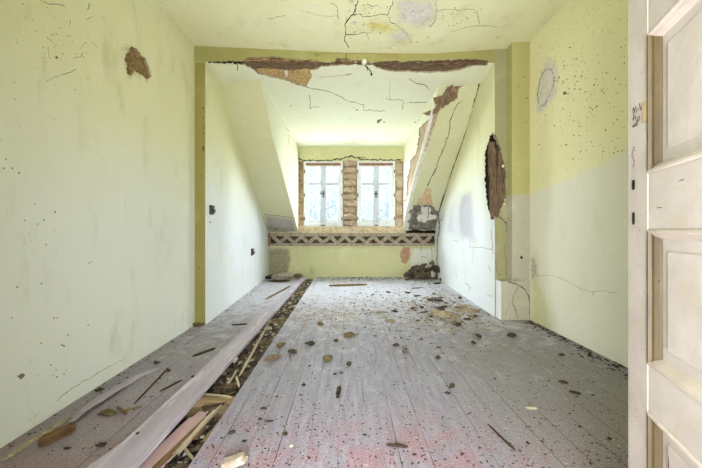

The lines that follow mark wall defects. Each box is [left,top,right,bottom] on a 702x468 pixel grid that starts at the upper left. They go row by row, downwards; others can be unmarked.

spalling [120,43,148,82]
spalling [241,54,488,85]
crack [305,1,428,112]
peeling [535,53,605,116]
spalling [396,84,460,233]
crack [421,84,530,318]
spalling [484,132,506,219]
peeling [400,247,435,269]